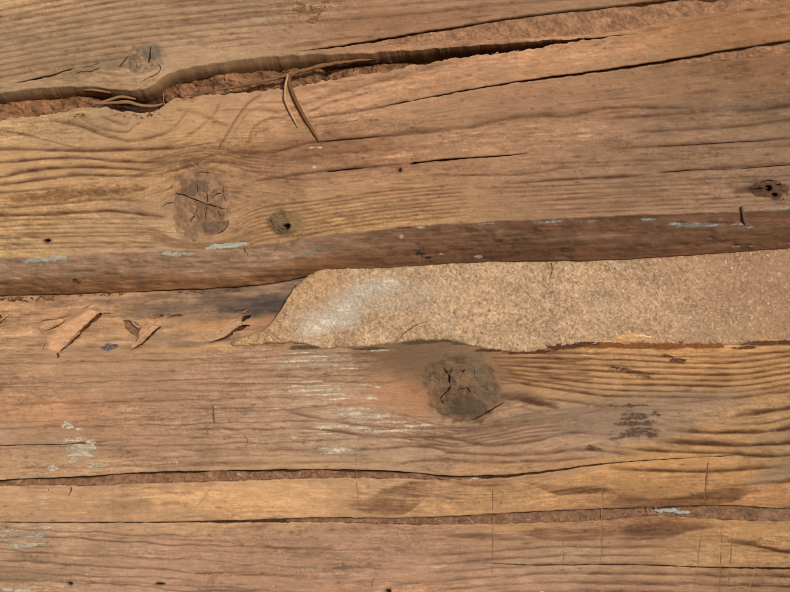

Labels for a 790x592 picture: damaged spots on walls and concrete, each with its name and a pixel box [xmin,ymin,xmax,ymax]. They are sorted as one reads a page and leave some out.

crack [0,0,790,123]
crack [324,165,368,175]
crack [407,150,529,168]
peeling [39,308,99,352]
spalling [121,318,158,348]
peeling [176,319,243,343]
crack [0,452,736,496]
crack [0,502,790,528]